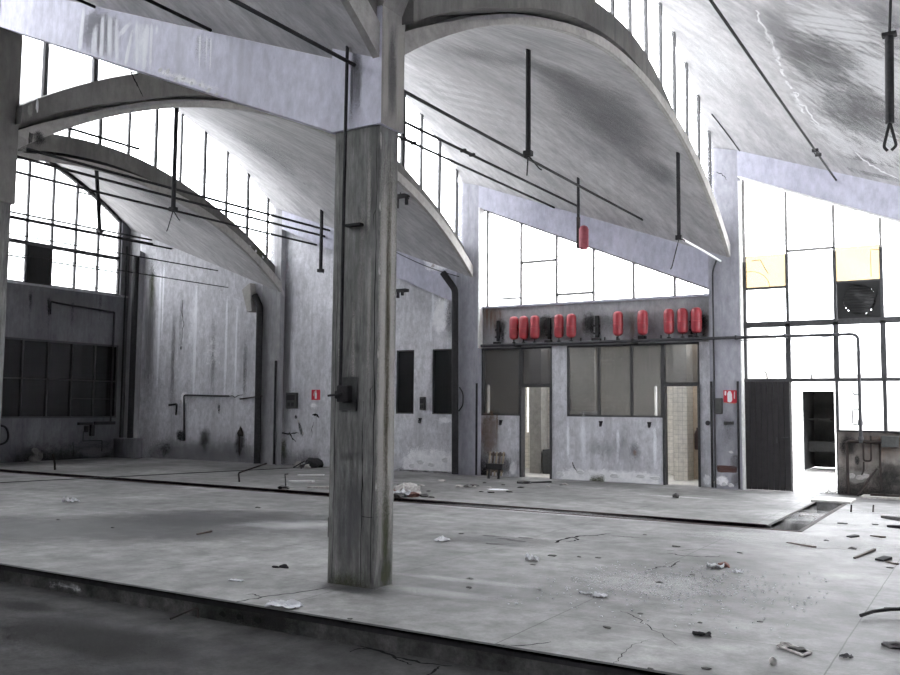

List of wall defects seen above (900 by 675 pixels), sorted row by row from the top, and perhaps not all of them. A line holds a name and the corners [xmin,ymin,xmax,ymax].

water stain [0,145,529,596]
water stain [817,460,900,496]
crack [555,533,637,543]
crack [350,646,447,675]